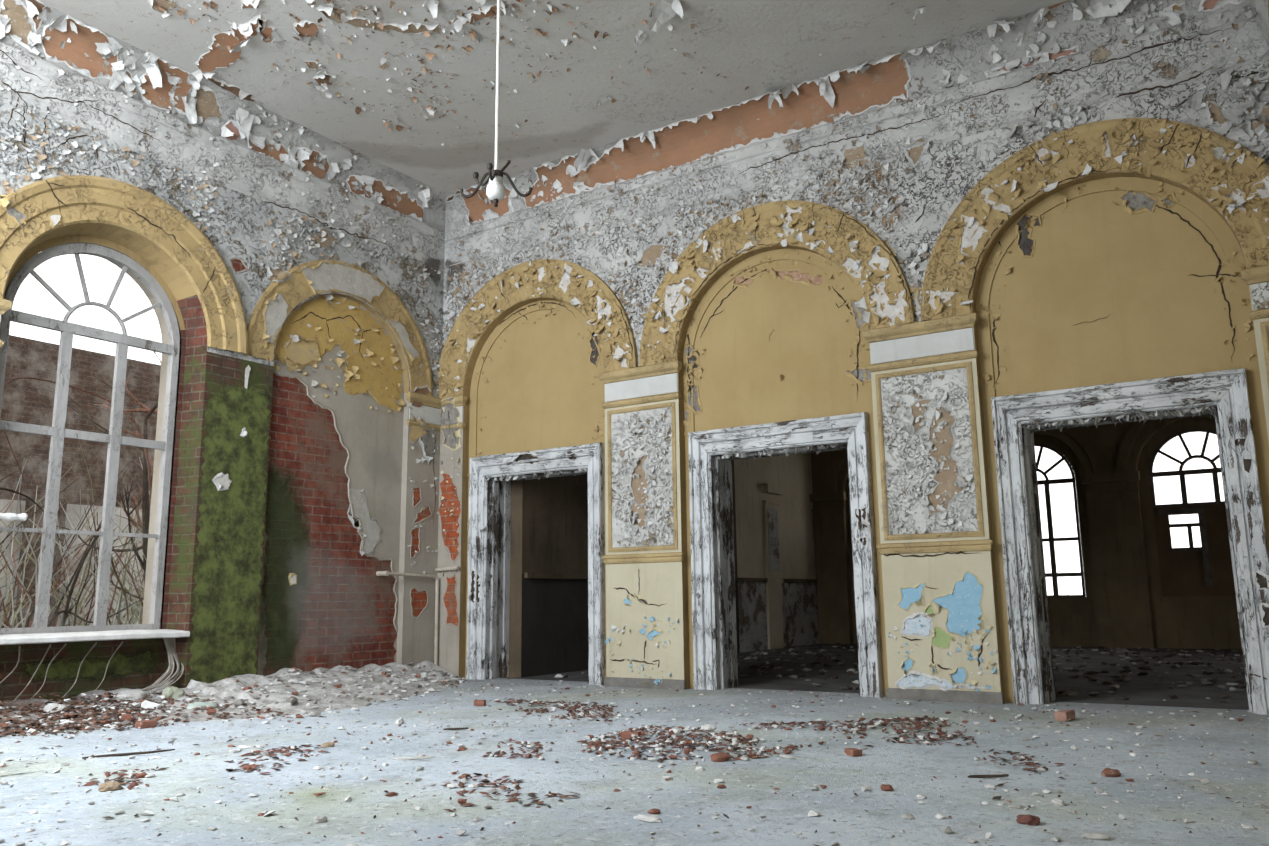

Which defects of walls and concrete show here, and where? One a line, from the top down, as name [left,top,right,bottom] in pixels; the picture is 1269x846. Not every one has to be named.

crack [0,50,168,209]
crack [739,28,1259,382]
flaking render [0,0,1269,676]
crack [832,286,860,401]
crack [615,570,667,606]